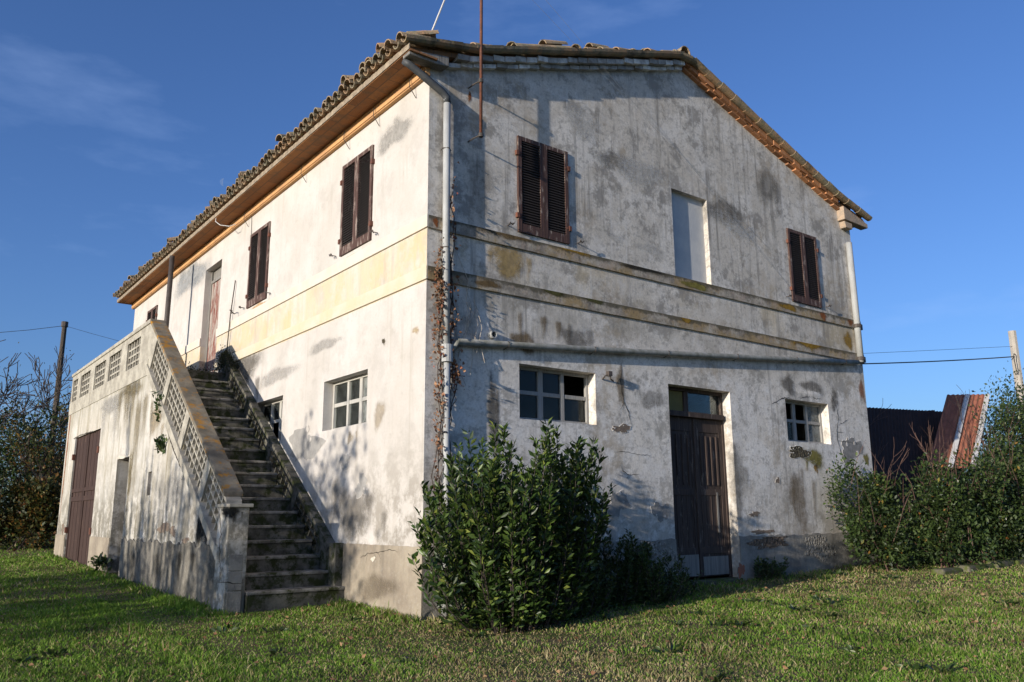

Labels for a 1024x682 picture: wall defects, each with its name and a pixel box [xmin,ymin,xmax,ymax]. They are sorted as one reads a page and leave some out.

damp [511,317,533,353]
damp [103,380,161,491]
spalling [789,445,812,459]
peeling [841,437,864,464]
spalling [746,511,789,550]
spalling [804,535,837,563]